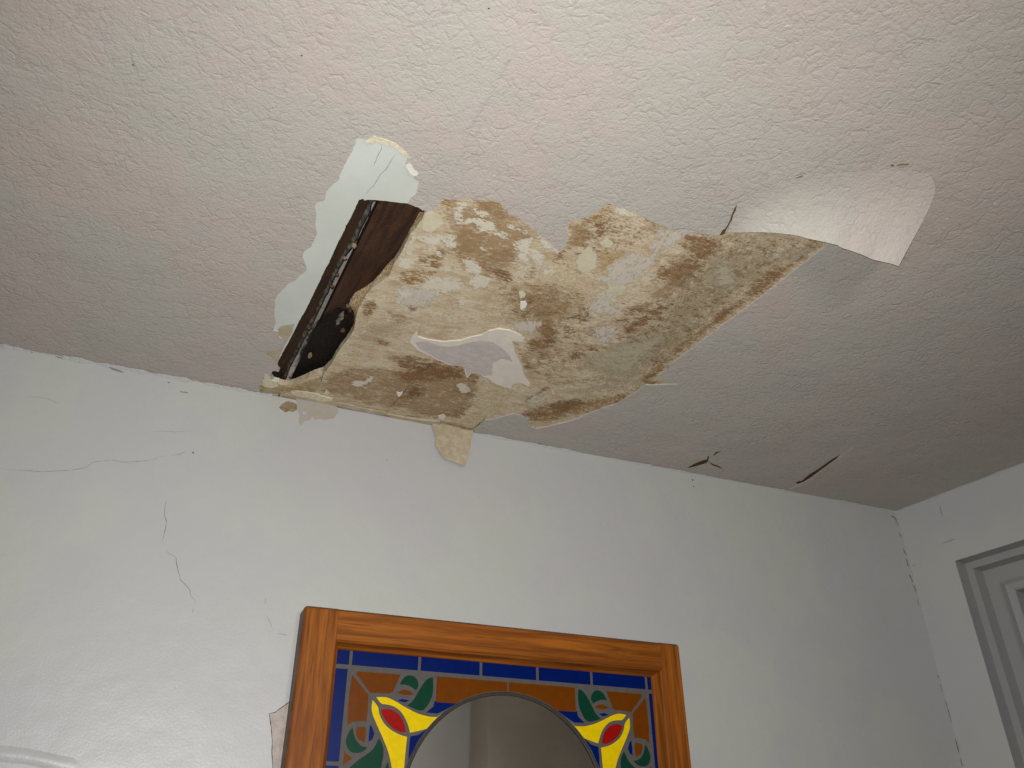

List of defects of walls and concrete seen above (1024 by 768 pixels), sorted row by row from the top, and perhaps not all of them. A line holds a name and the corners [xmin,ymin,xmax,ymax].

flaking render [260,136,935,466]
crack [788,447,854,490]